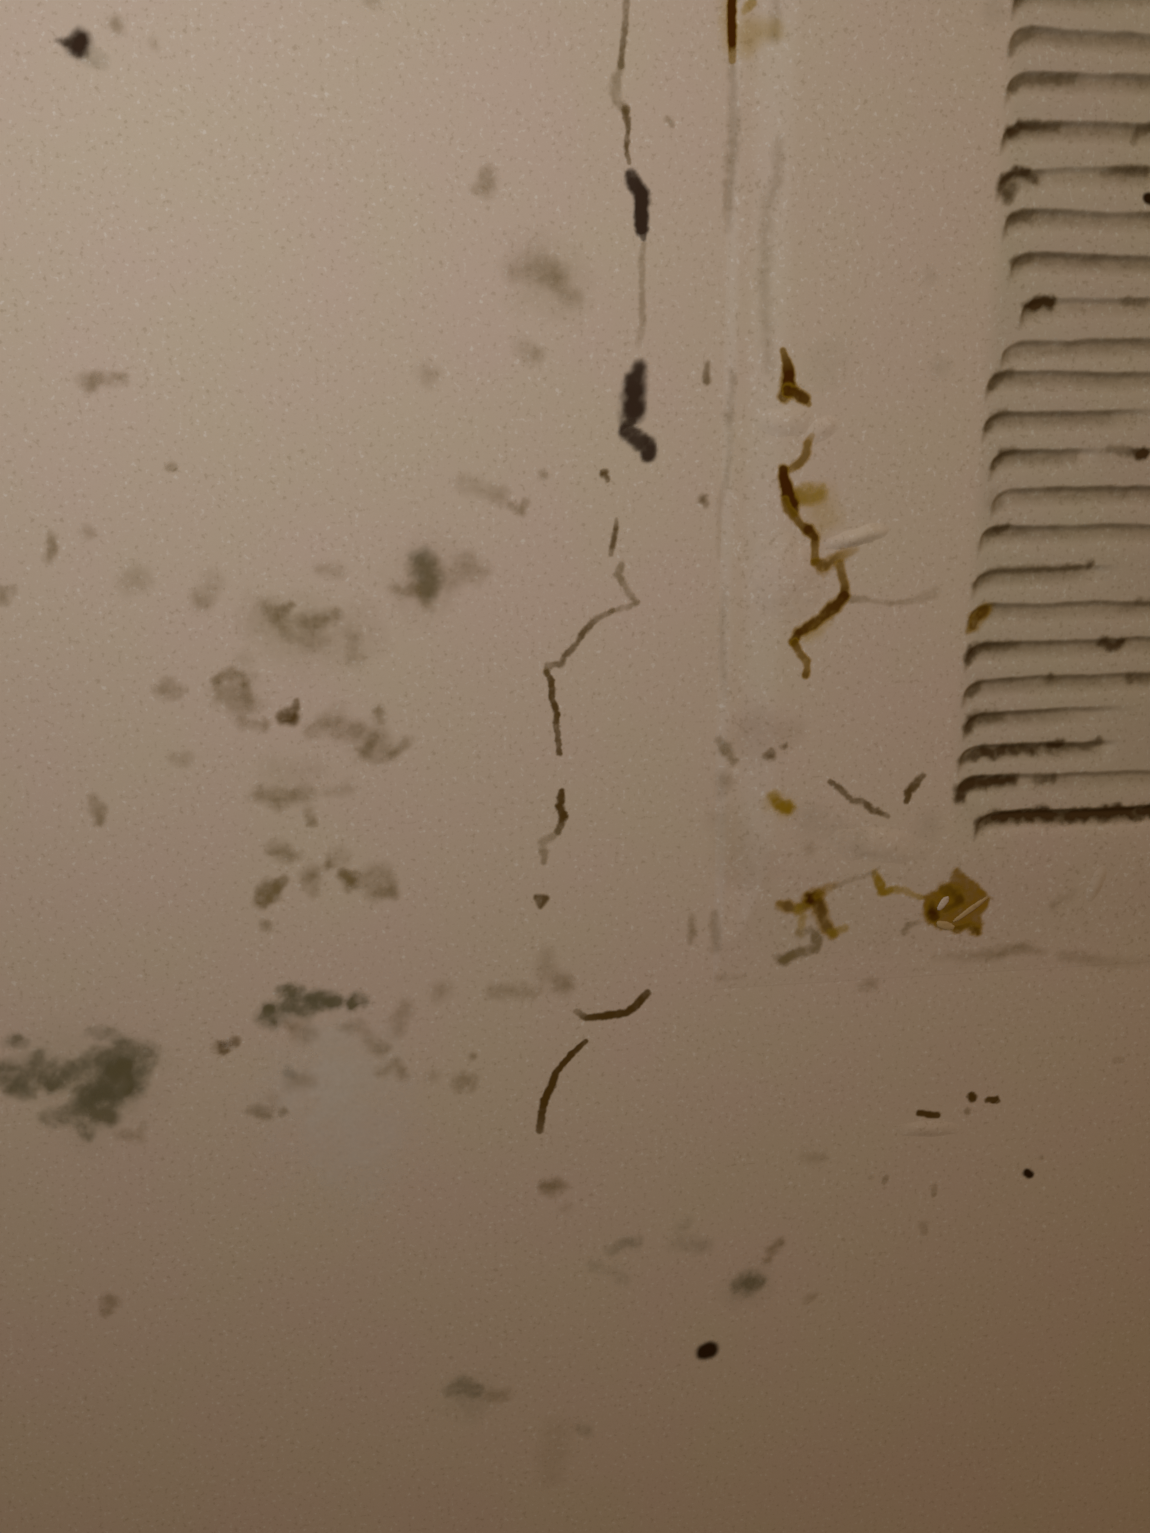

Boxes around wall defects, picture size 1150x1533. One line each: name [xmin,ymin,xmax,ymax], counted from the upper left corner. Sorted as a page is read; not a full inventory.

crack [618,28,626,67]
crack [622,107,630,156]
crack [600,470,609,481]
crack [610,525,637,605]
crack [778,439,850,679]
crack [545,622,594,834]
crack [534,895,549,908]
corrosion [923,869,990,936]
mould [262,985,358,1025]
mould [74,1041,136,1124]
crack [536,990,650,1133]